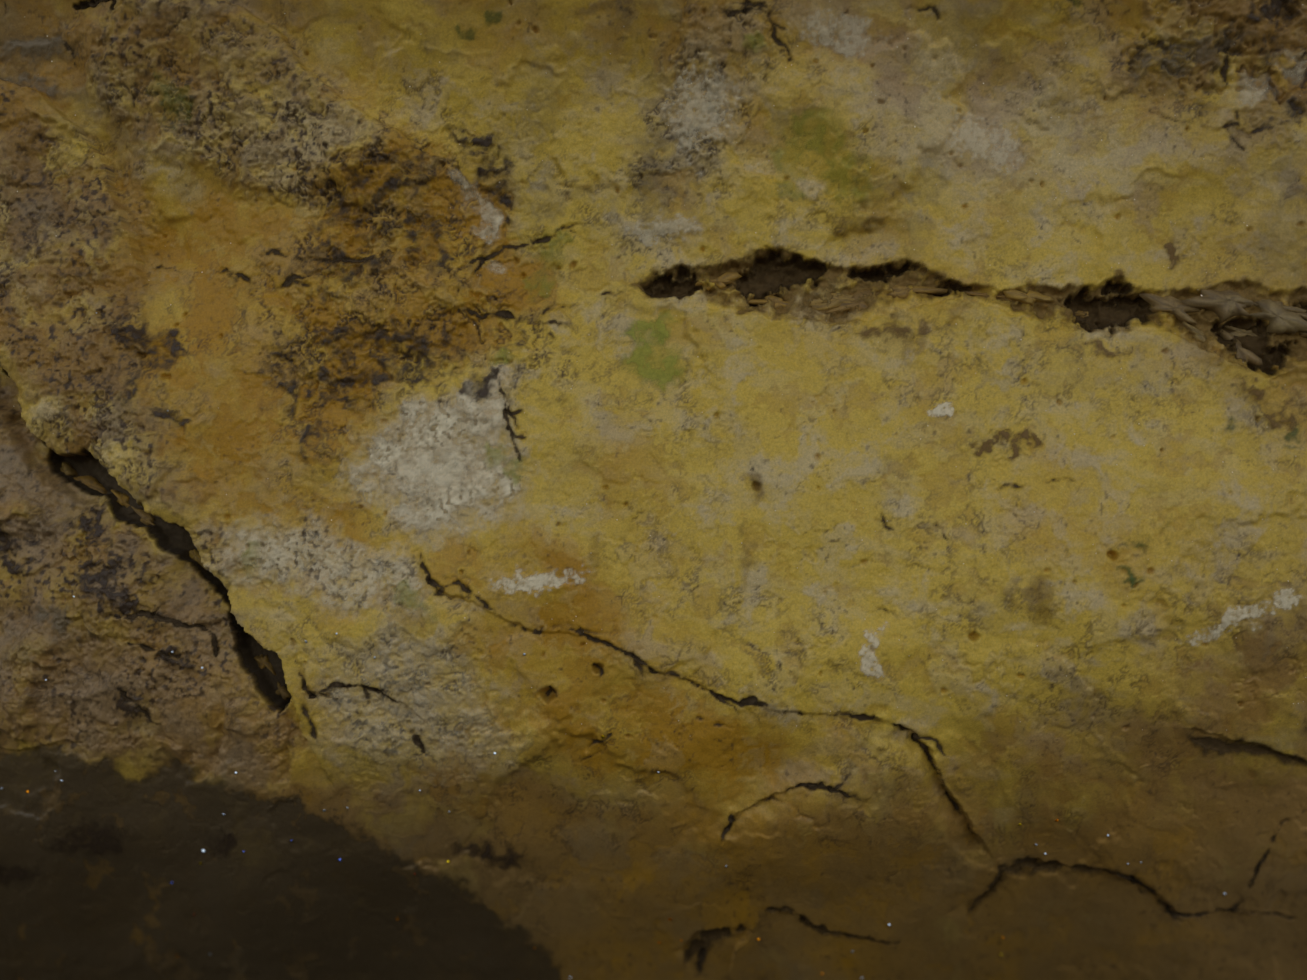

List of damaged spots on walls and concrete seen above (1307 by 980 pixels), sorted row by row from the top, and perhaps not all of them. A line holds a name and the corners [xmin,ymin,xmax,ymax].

water stain [1252,97,1304,133]
water stain [450,129,512,243]
water stain [315,154,454,281]
water stain [259,320,464,459]
water stain [459,368,498,399]
crack [126,607,218,658]
crack [420,554,768,726]
crack [119,690,152,722]
crack [766,775,861,801]
crack [836,713,973,833]
crack [721,814,735,840]